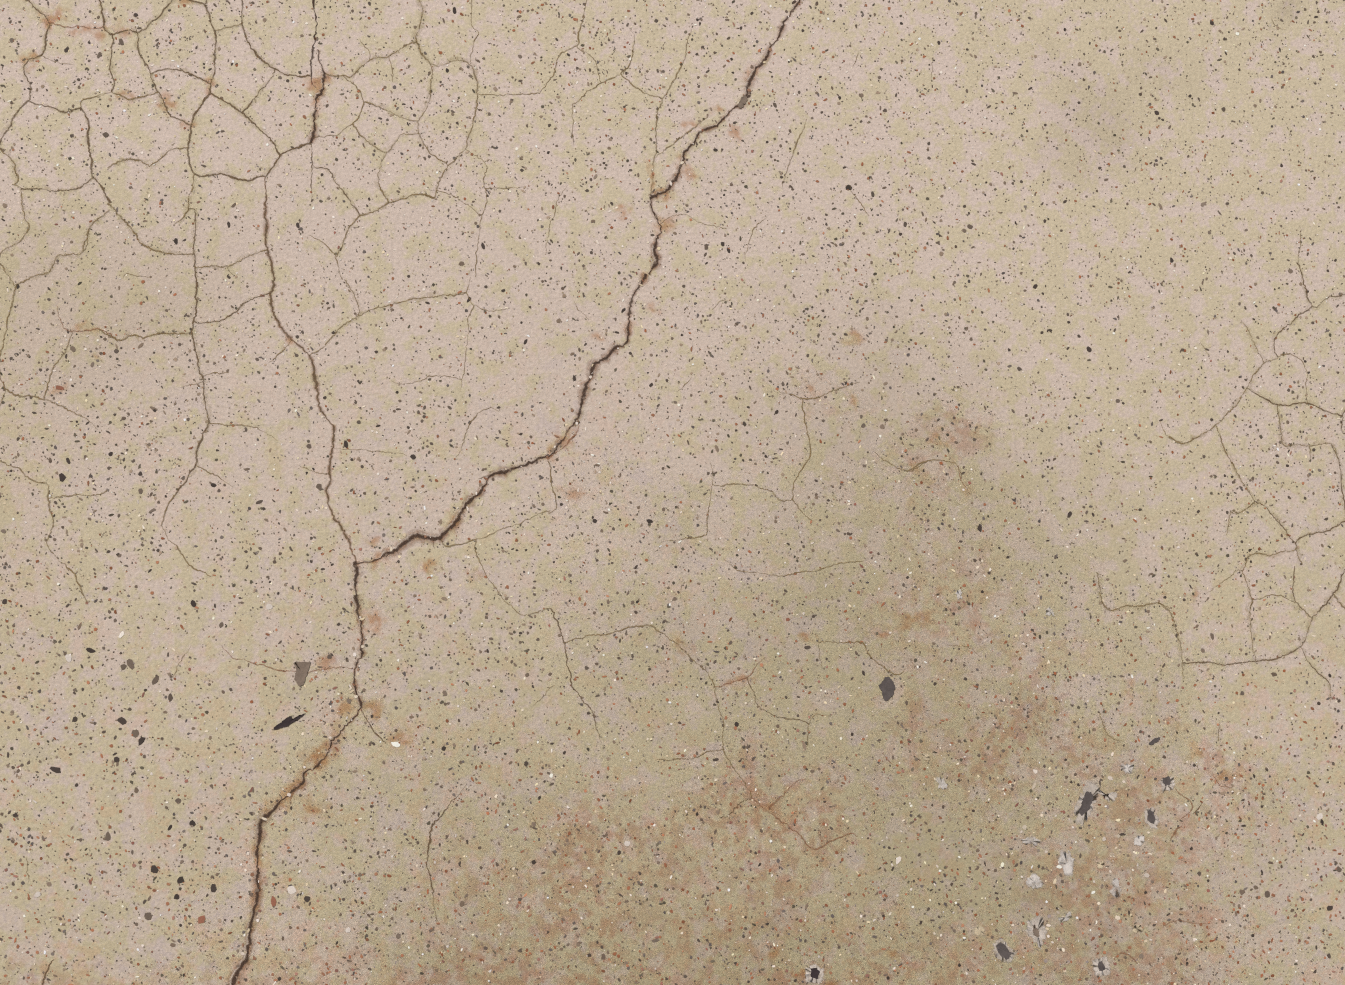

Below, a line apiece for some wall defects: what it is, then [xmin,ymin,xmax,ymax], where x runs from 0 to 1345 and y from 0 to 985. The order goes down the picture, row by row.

crack [0,0,864,985]
crack [818,641,906,675]
crack [875,452,968,490]
crack [1098,231,1345,702]